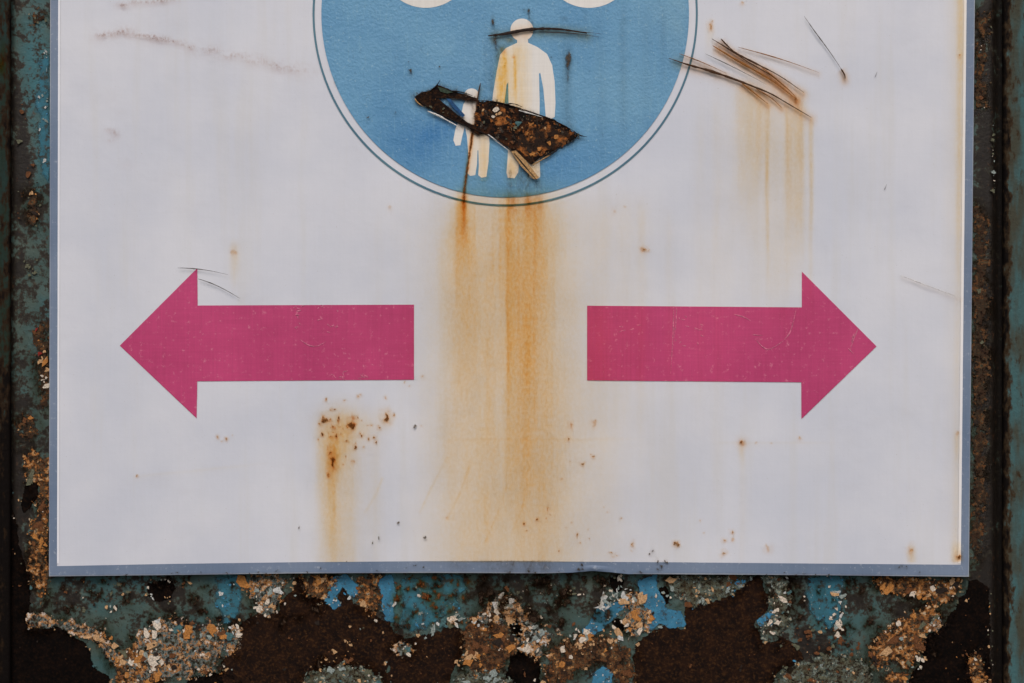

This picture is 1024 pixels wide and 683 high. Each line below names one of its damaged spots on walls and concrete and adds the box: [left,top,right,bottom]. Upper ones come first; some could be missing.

peeling [14,320,963,683]
peeling [968,648,988,683]